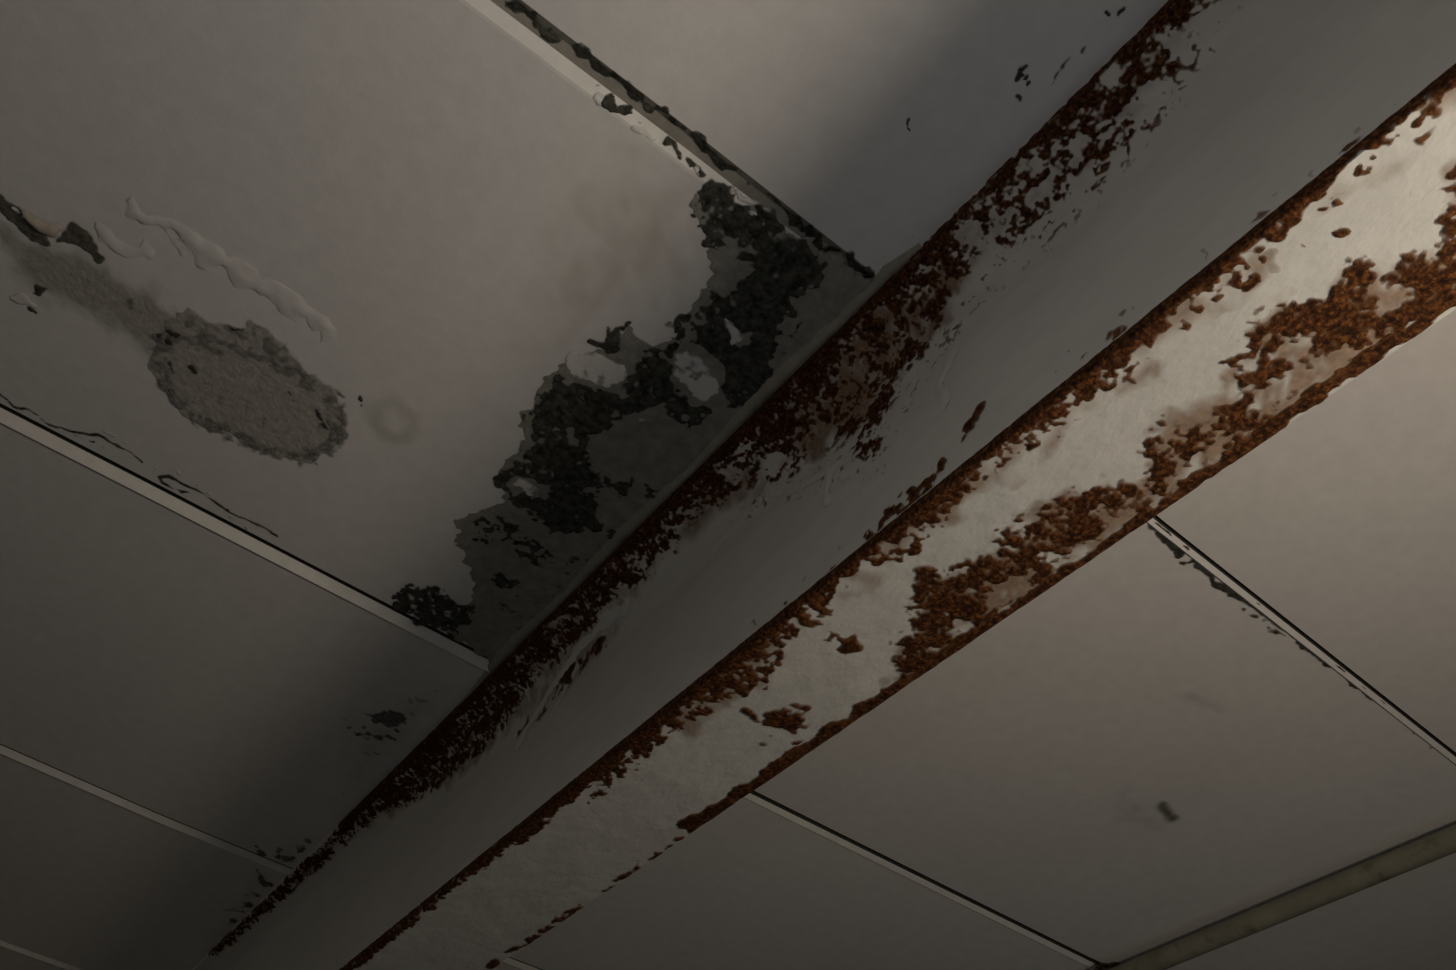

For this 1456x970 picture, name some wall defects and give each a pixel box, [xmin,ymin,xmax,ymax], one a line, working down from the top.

peeling [0,194,104,264]
damp [2,230,174,350]
flaking render [148,308,348,466]
peeling [392,1,876,663]
rust [339,63,1456,970]